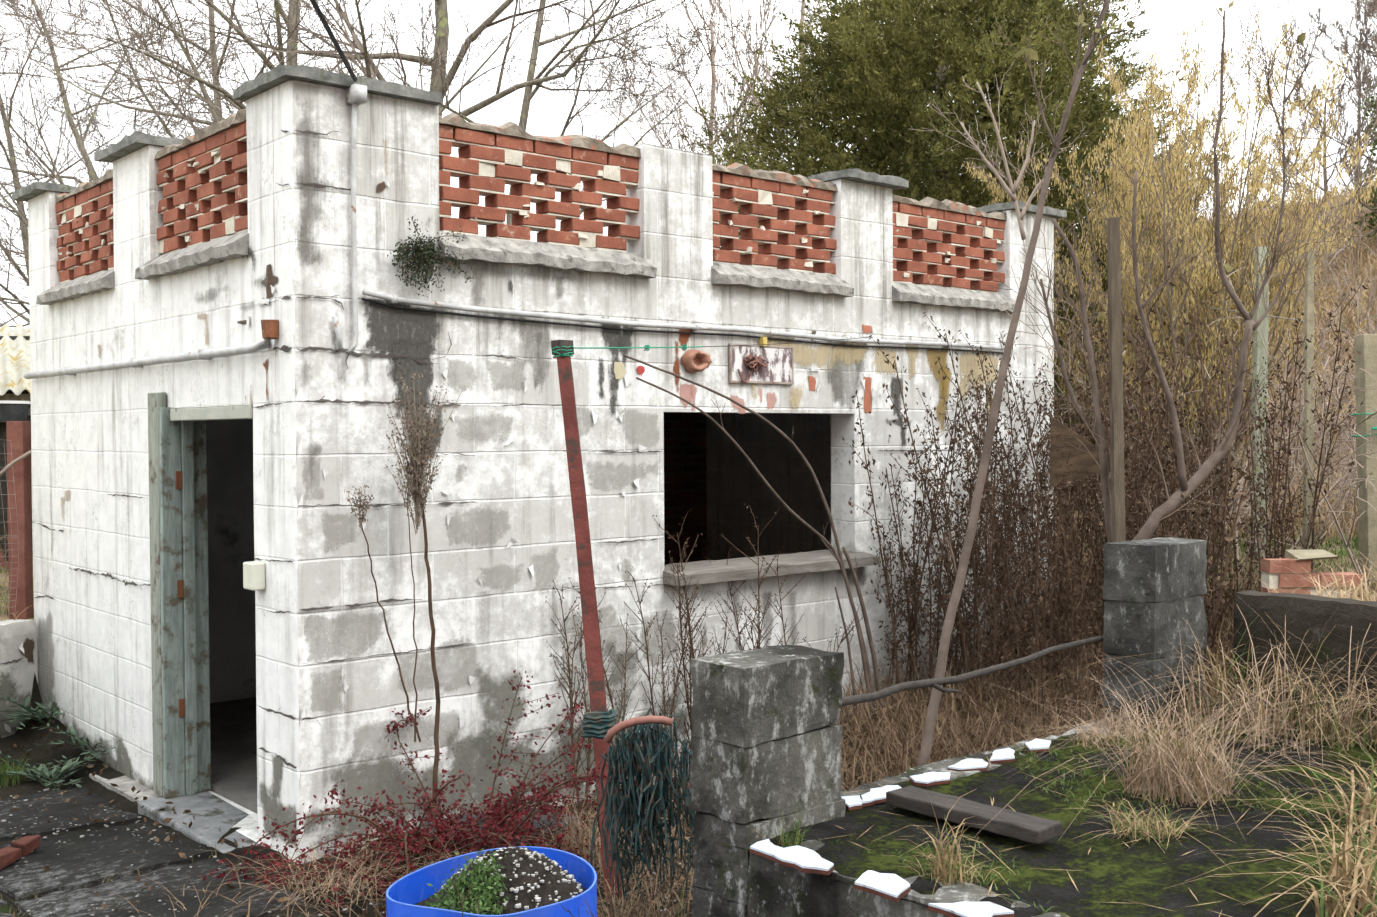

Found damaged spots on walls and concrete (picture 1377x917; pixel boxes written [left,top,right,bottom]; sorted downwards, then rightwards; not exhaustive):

damp [362,298,443,459]
crack [31,521,150,589]
damp [0,616,153,790]
damp [260,643,688,849]